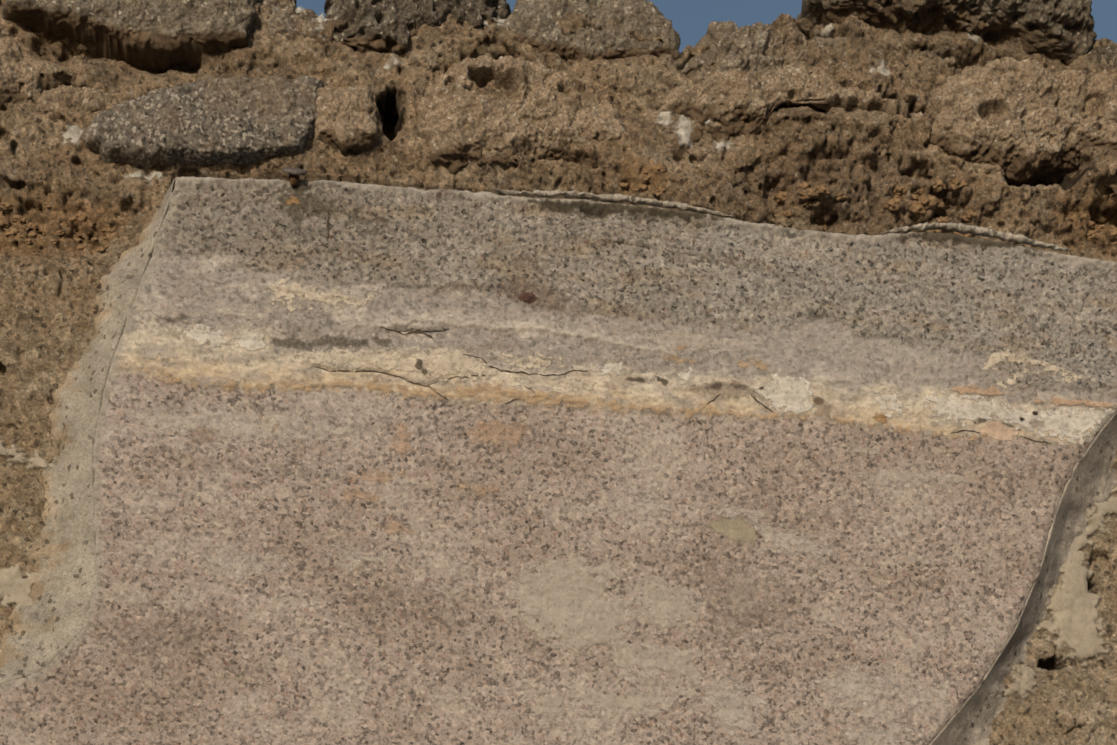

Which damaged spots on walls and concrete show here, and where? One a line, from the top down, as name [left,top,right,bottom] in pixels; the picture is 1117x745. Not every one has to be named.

crack [384,327,433,338]
crack [314,354,586,405]
peeling [712,373,823,416]
peeling [982,349,1085,389]
peeling [873,389,1117,448]